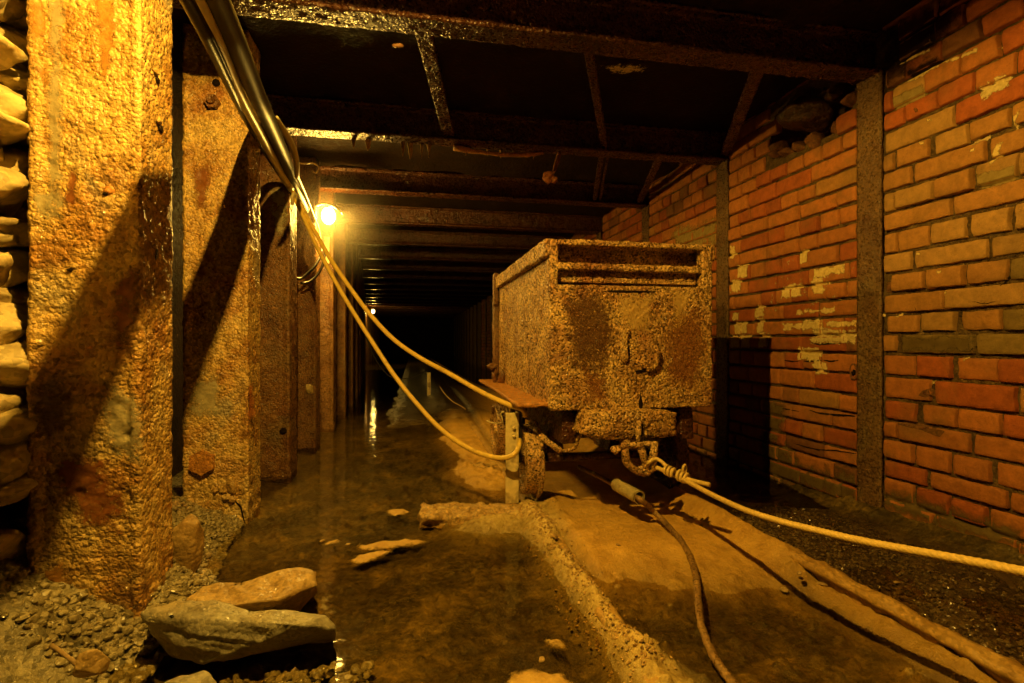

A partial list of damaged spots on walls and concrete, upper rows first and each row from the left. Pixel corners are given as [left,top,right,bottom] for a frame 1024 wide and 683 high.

rust [95,0,114,76]
leakage [979,73,1013,100]
rust [193,165,210,205]
leakage [729,246,857,374]
rust [57,439,125,525]